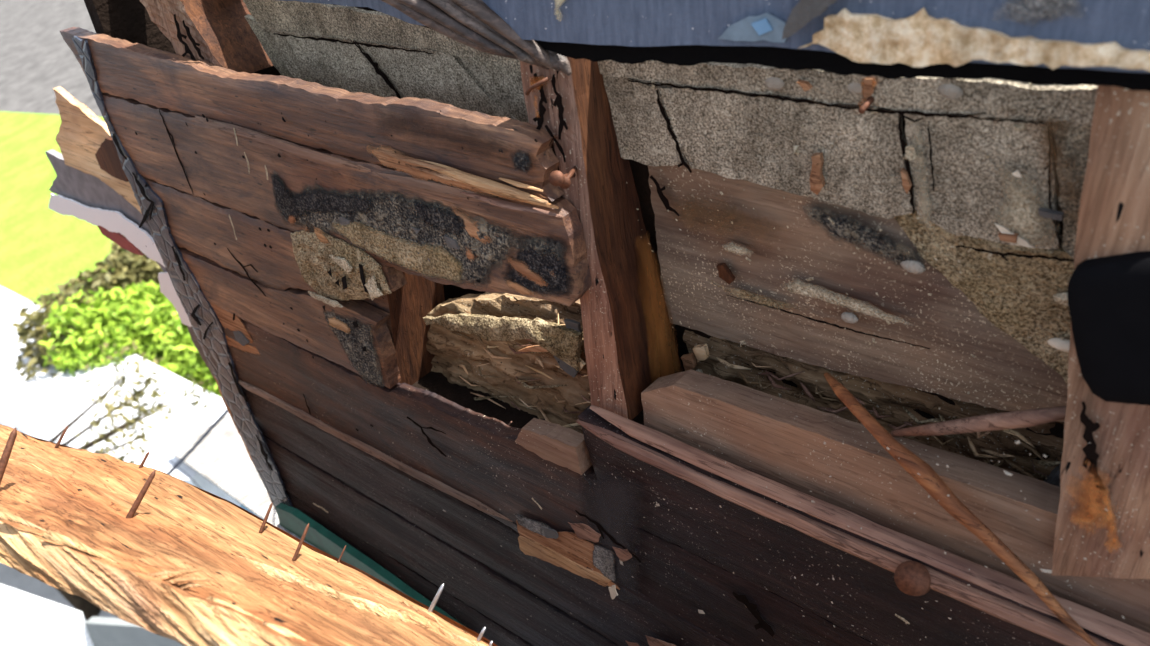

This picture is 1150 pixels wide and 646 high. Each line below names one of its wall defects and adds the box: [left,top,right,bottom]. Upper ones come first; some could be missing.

peeling [718,12,786,43]
peeling [798,8,1150,71]
crack [628,80,1074,262]
peeling [444,208,489,260]
spalling [288,216,392,333]
peeling [507,257,546,295]
peeling [515,514,632,599]